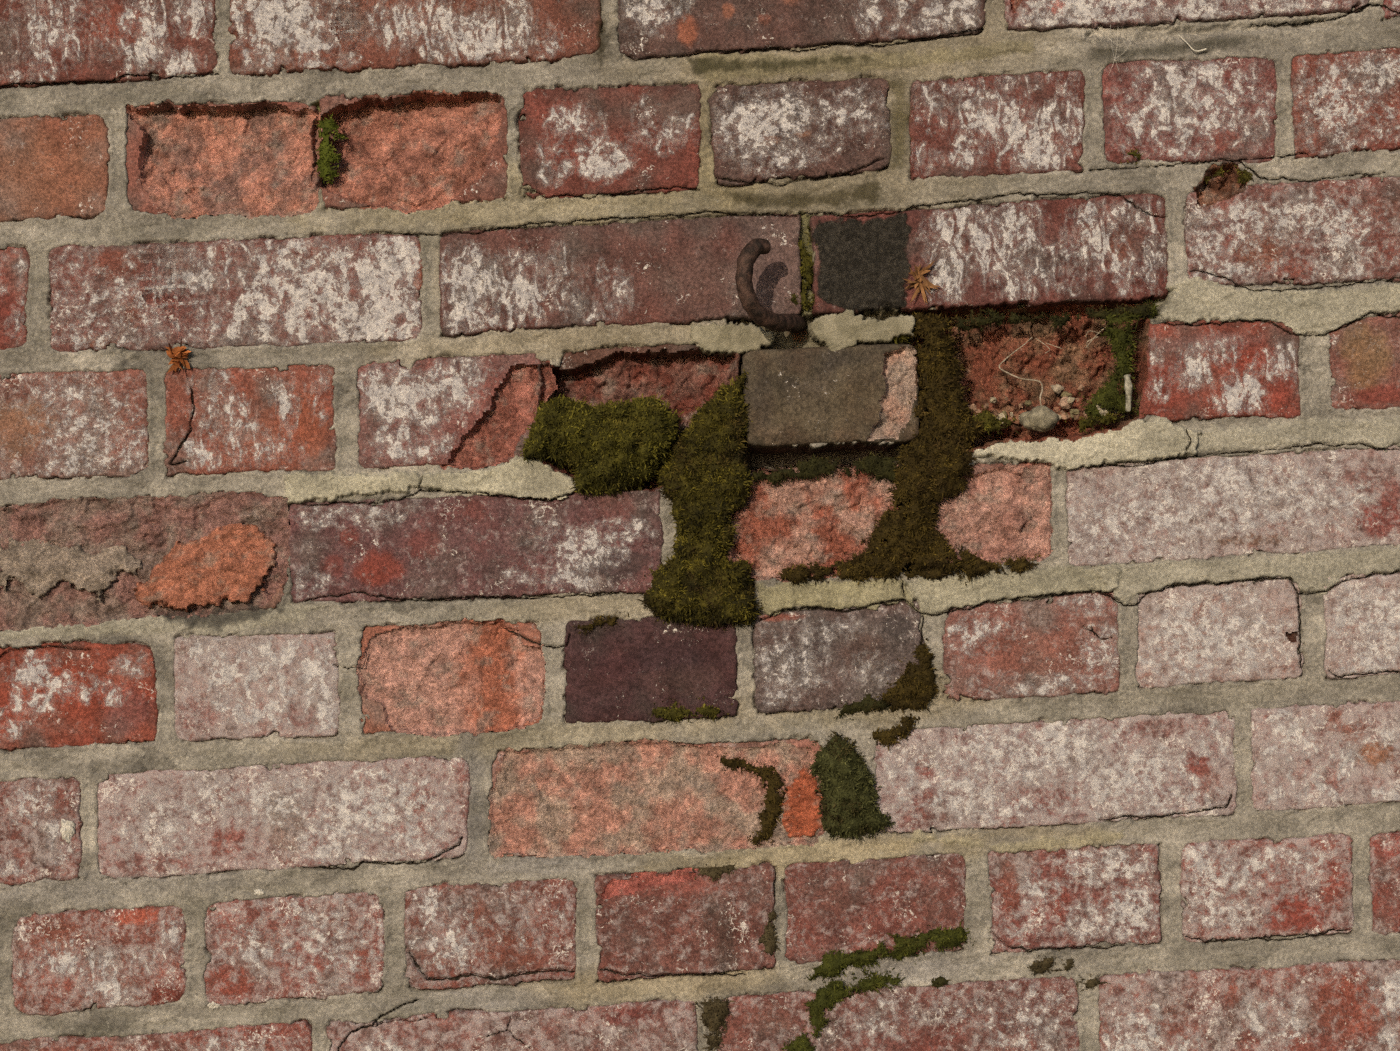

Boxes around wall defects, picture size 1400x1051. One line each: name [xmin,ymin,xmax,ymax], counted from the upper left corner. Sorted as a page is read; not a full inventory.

water stain [10,0,212,83]
water stain [230,0,558,72]
water stain [713,86,888,172]
water stain [916,73,1083,169]
water stain [1110,62,1274,158]
spalling [1193,162,1252,207]
water stain [1188,188,1400,281]
crack [170,387,194,464]
spalling [543,458,575,478]
spalling [439,347,738,470]
spalling [866,301,1150,452]
spalling [0,490,291,631]